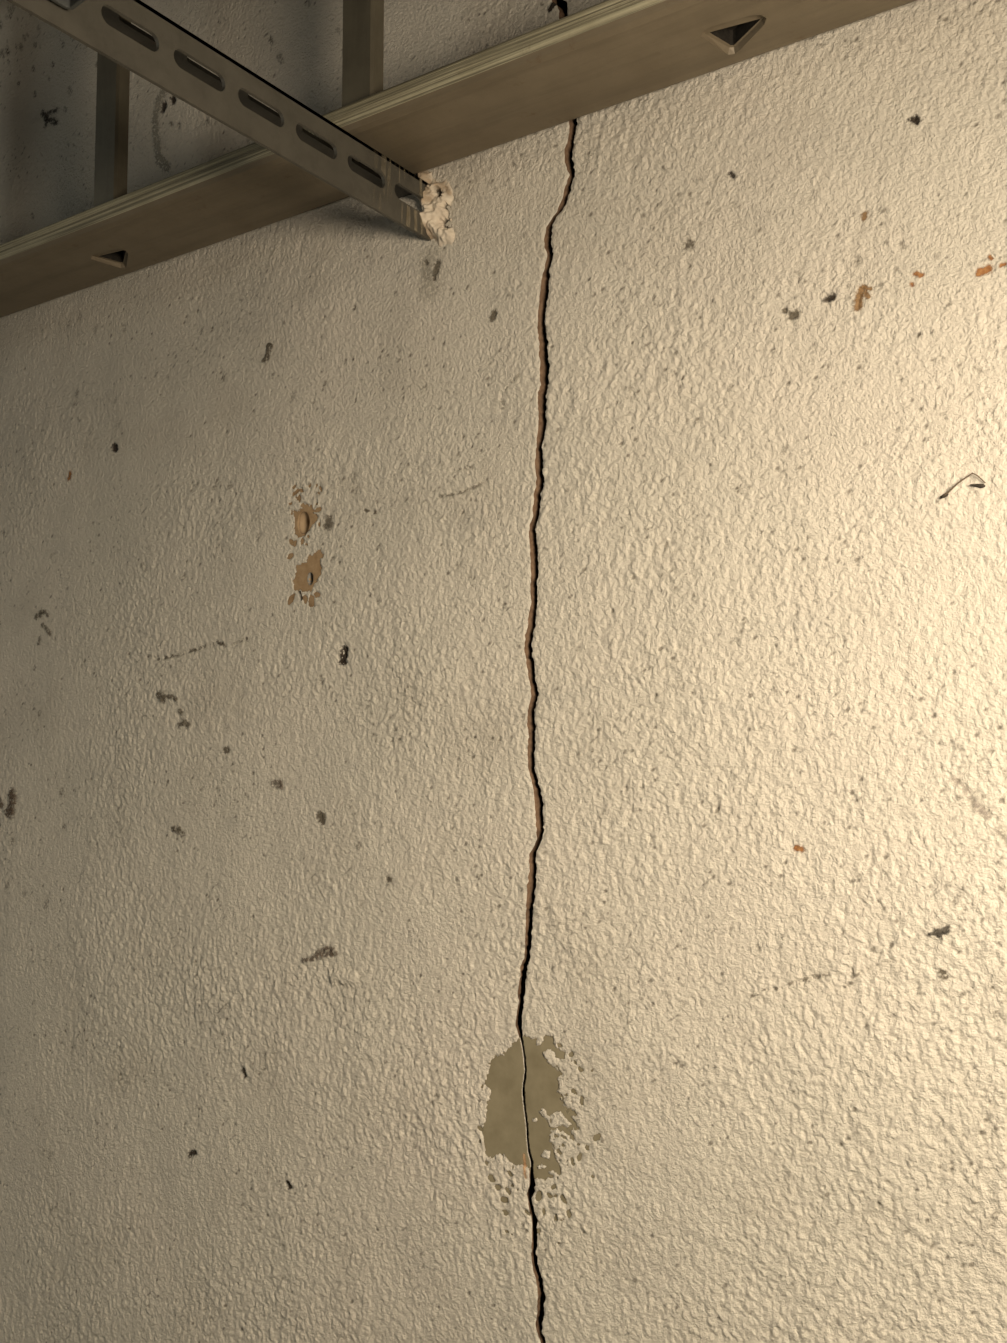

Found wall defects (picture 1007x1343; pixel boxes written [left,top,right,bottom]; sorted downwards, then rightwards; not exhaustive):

crack [548,0,568,19]
peeling [287,483,333,607]
crack [501,118,578,1343]
peeling [477,1035,601,1235]